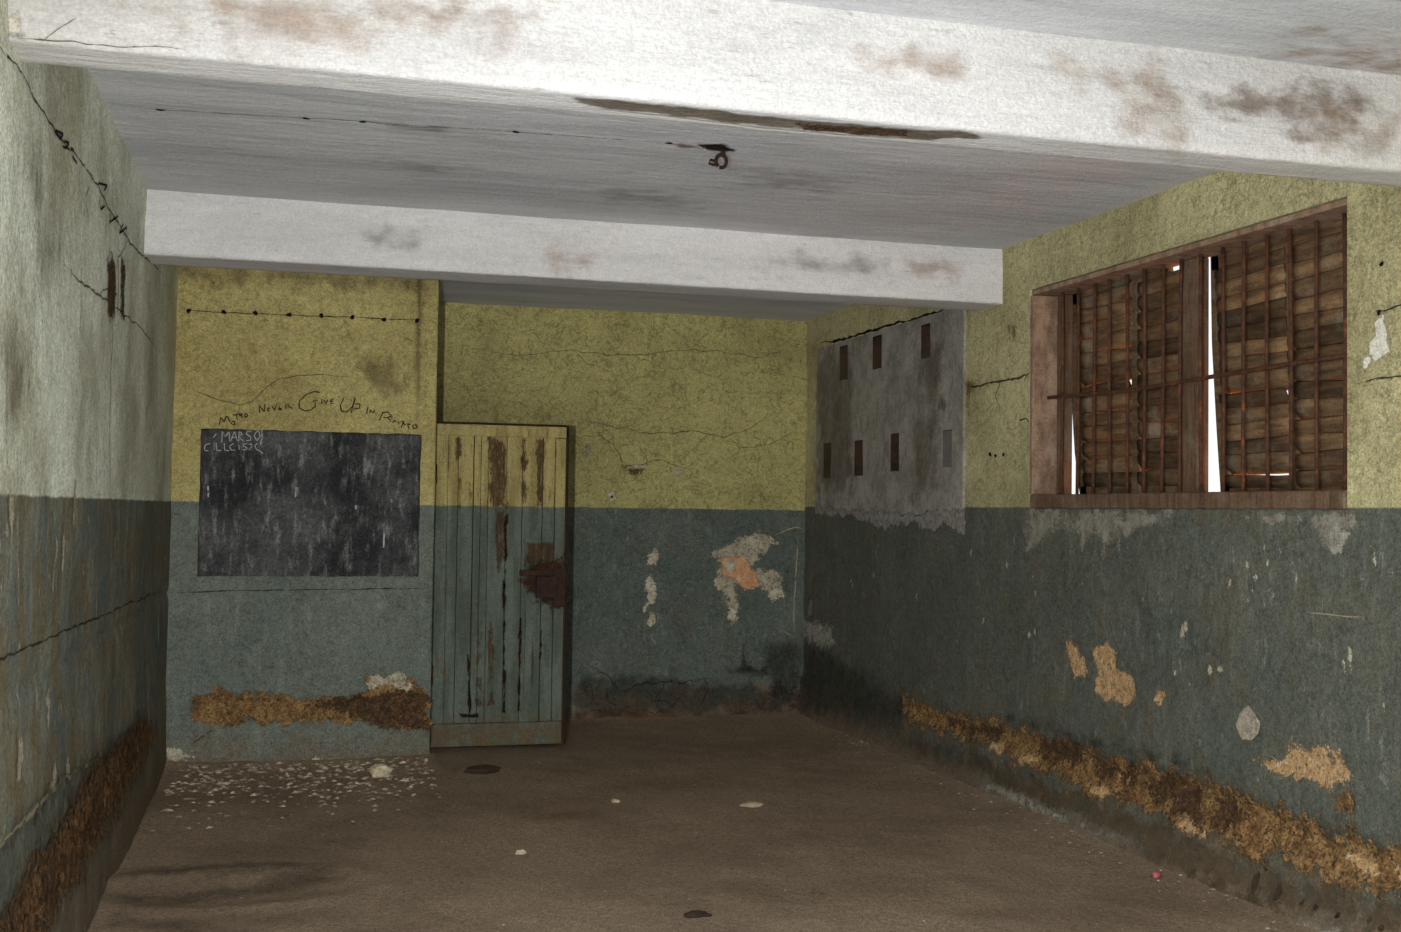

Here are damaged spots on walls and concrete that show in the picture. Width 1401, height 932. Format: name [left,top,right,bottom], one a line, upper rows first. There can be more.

crack [0,18,184,344]
crack [177,309,430,323]
peeling [1363,314,1389,369]
crack [0,588,422,660]
peeling [642,548,659,628]
peeling [711,527,802,638]
spalling [181,670,433,732]
peeling [1066,640,1137,707]
spalling [900,686,1401,931]